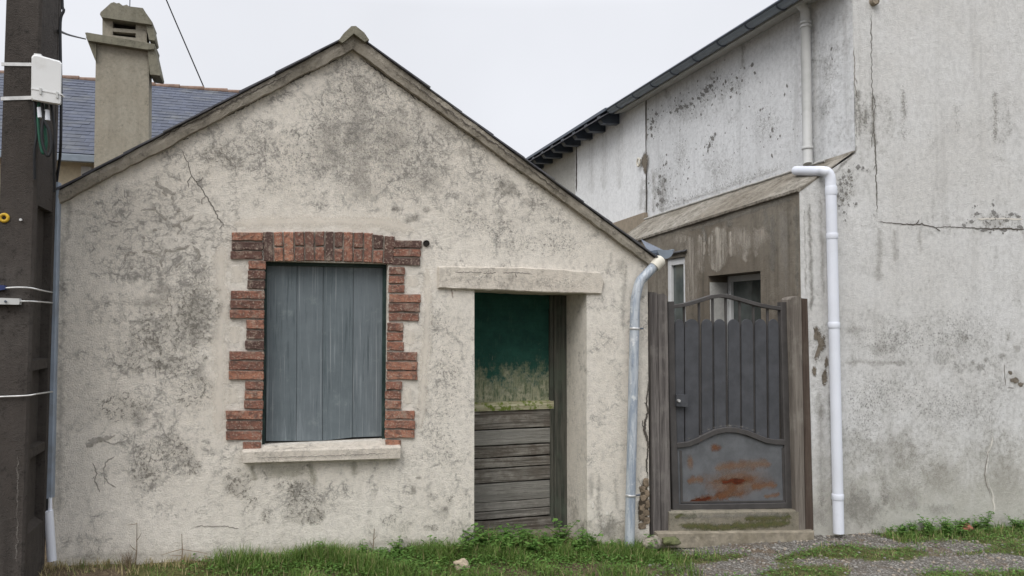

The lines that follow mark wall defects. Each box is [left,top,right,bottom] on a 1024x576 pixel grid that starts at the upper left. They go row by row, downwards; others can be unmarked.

crack [156,60,335,229]
crack [853,16,1024,231]
peeling [962,199,1023,234]
spalling [812,327,829,386]
crack [93,437,201,492]
rust [691,477,753,504]